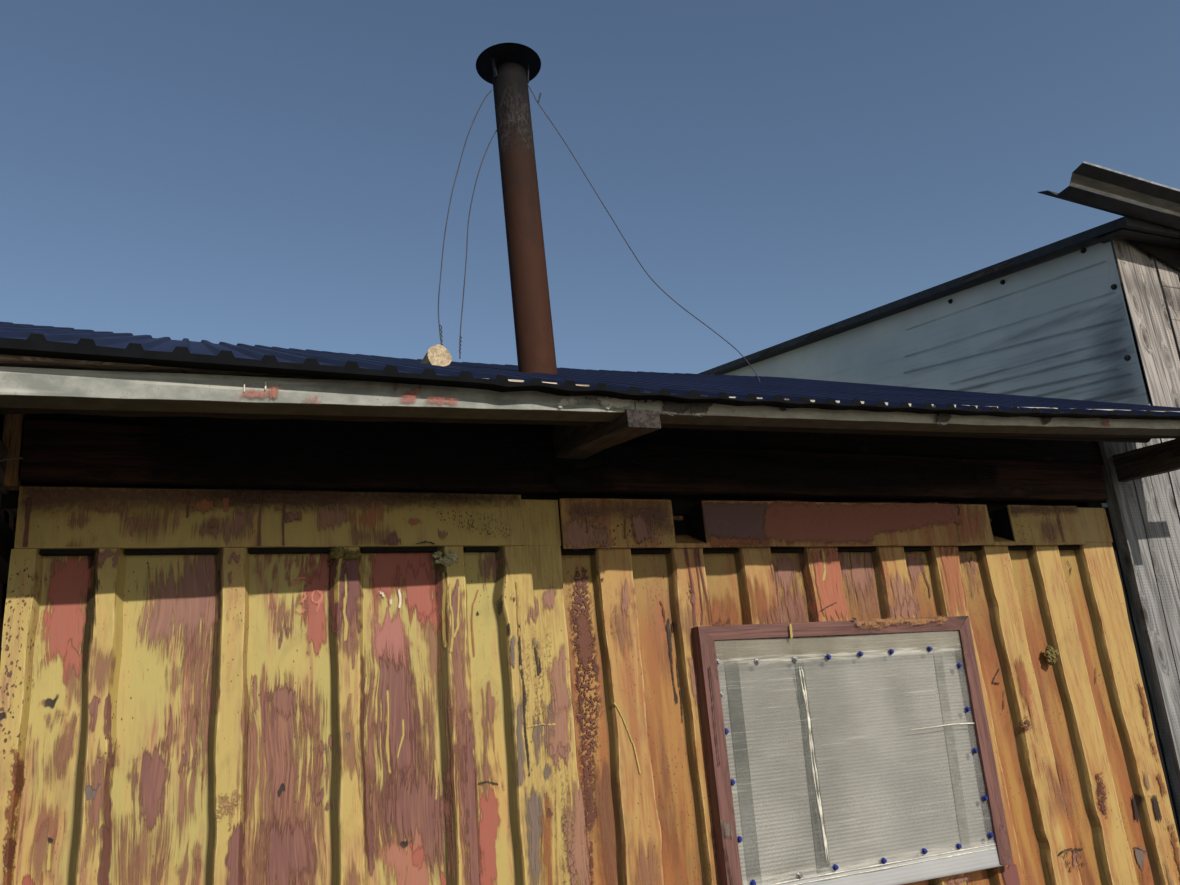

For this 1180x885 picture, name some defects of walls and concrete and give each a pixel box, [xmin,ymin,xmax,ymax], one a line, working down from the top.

peeling [0,497,255,885]
peeling [213,498,577,885]
peeling [562,773,593,885]
corrosion [569,568,618,885]
peeling [563,502,673,550]
peeling [703,500,987,638]